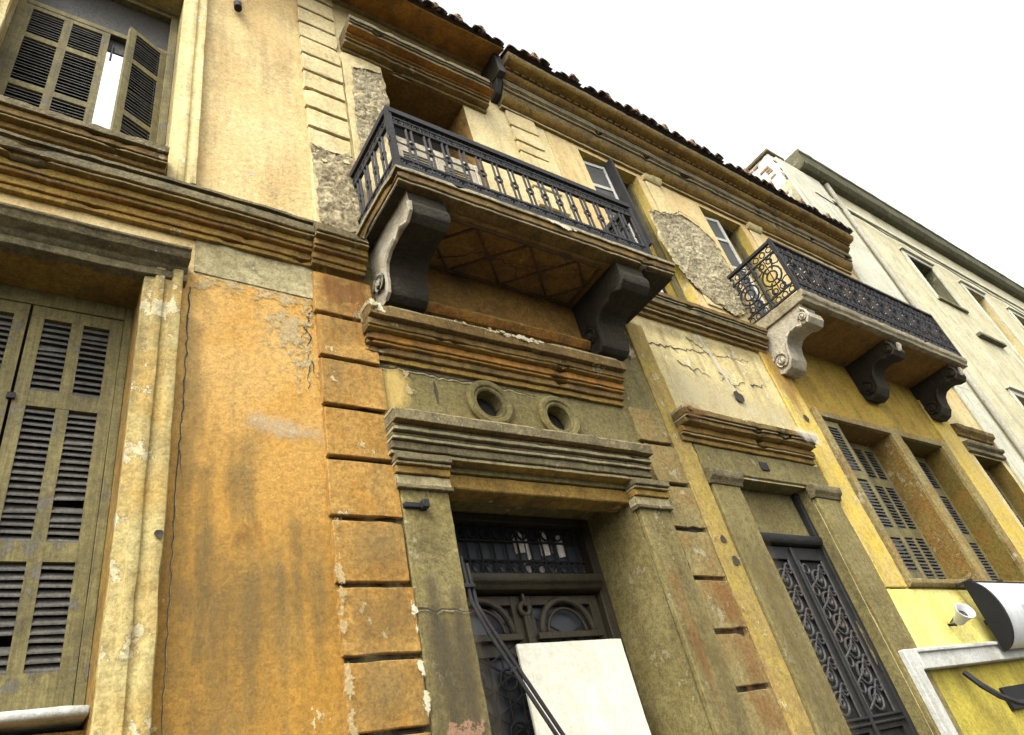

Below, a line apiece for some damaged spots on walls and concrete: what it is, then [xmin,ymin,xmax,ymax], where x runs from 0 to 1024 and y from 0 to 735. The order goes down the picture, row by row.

flaking render [309,66,390,232]
flaking render [648,209,747,317]
peeling [186,273,319,397]
crack [649,337,762,392]
crack [161,287,192,735]